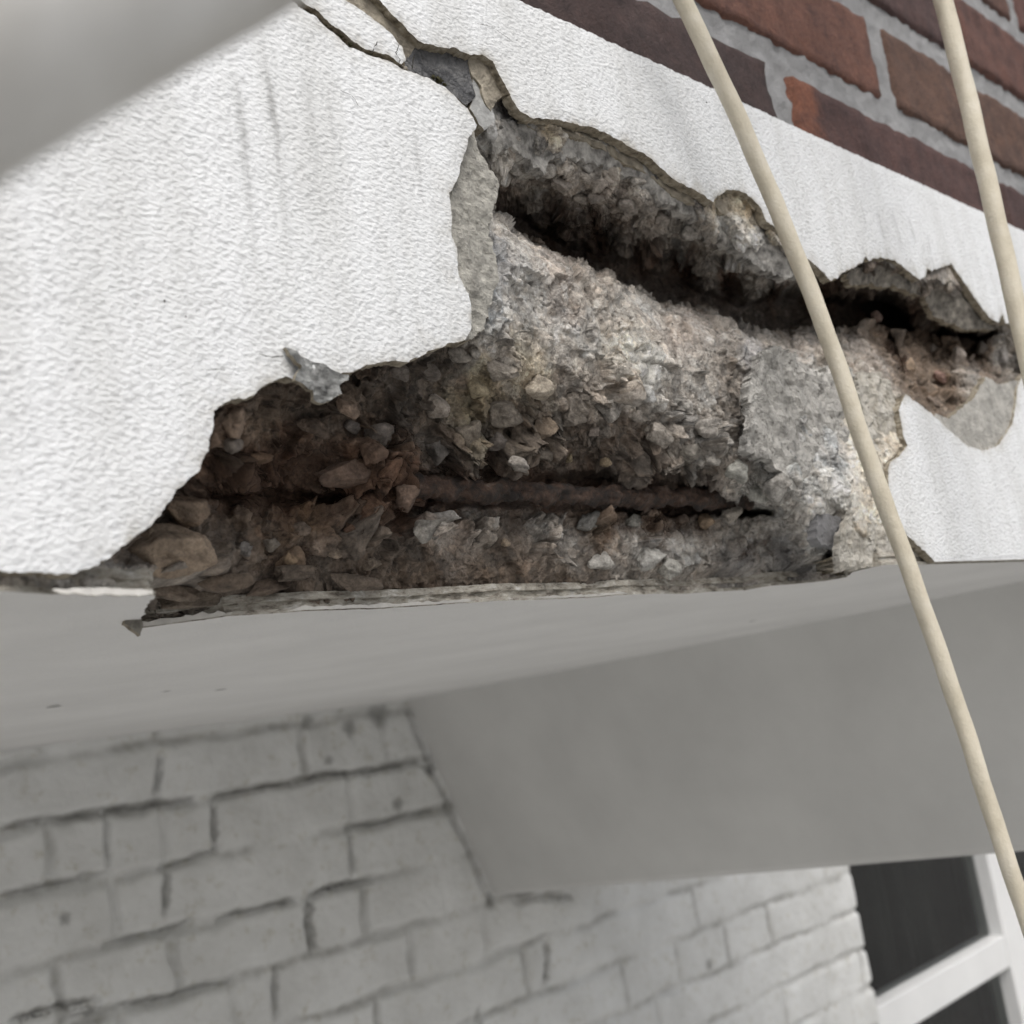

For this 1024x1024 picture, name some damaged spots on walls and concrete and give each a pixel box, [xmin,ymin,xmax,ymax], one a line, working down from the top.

crack [325,24,447,87]
spalling [0,0,893,637]
spalling [815,260,1021,472]